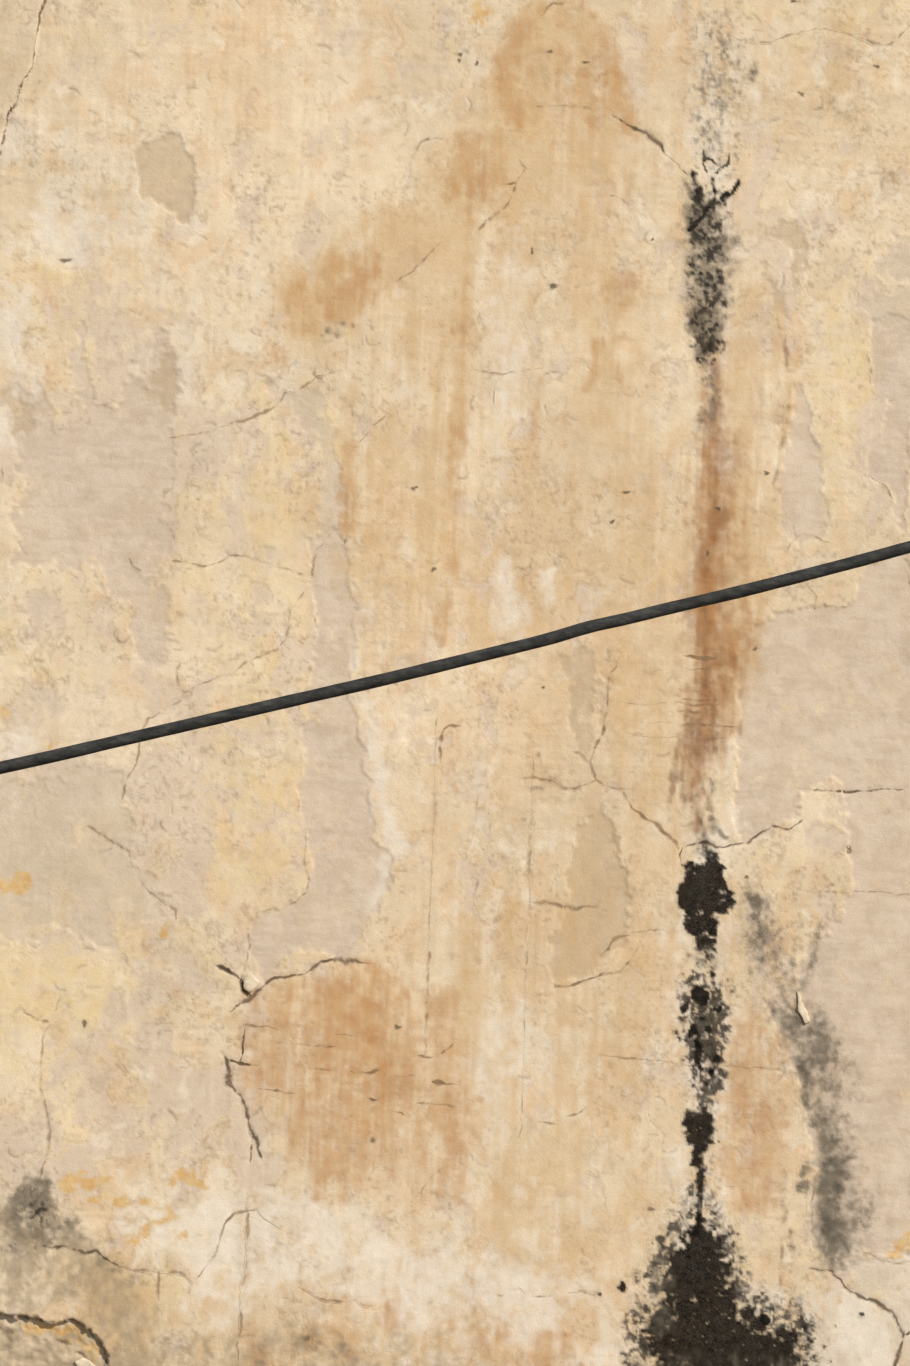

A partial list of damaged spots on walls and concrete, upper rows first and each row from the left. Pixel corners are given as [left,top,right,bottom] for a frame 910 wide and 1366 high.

crack [0,0,47,157]
damp [261,0,882,681]
corrosion [661,355,769,847]
corrosion [769,317,796,505]
spalling [0,1315,101,1366]
crack [214,717,462,1163]
damp [0,613,910,1366]
crack [519,642,910,1181]
crack [603,1055,910,1366]